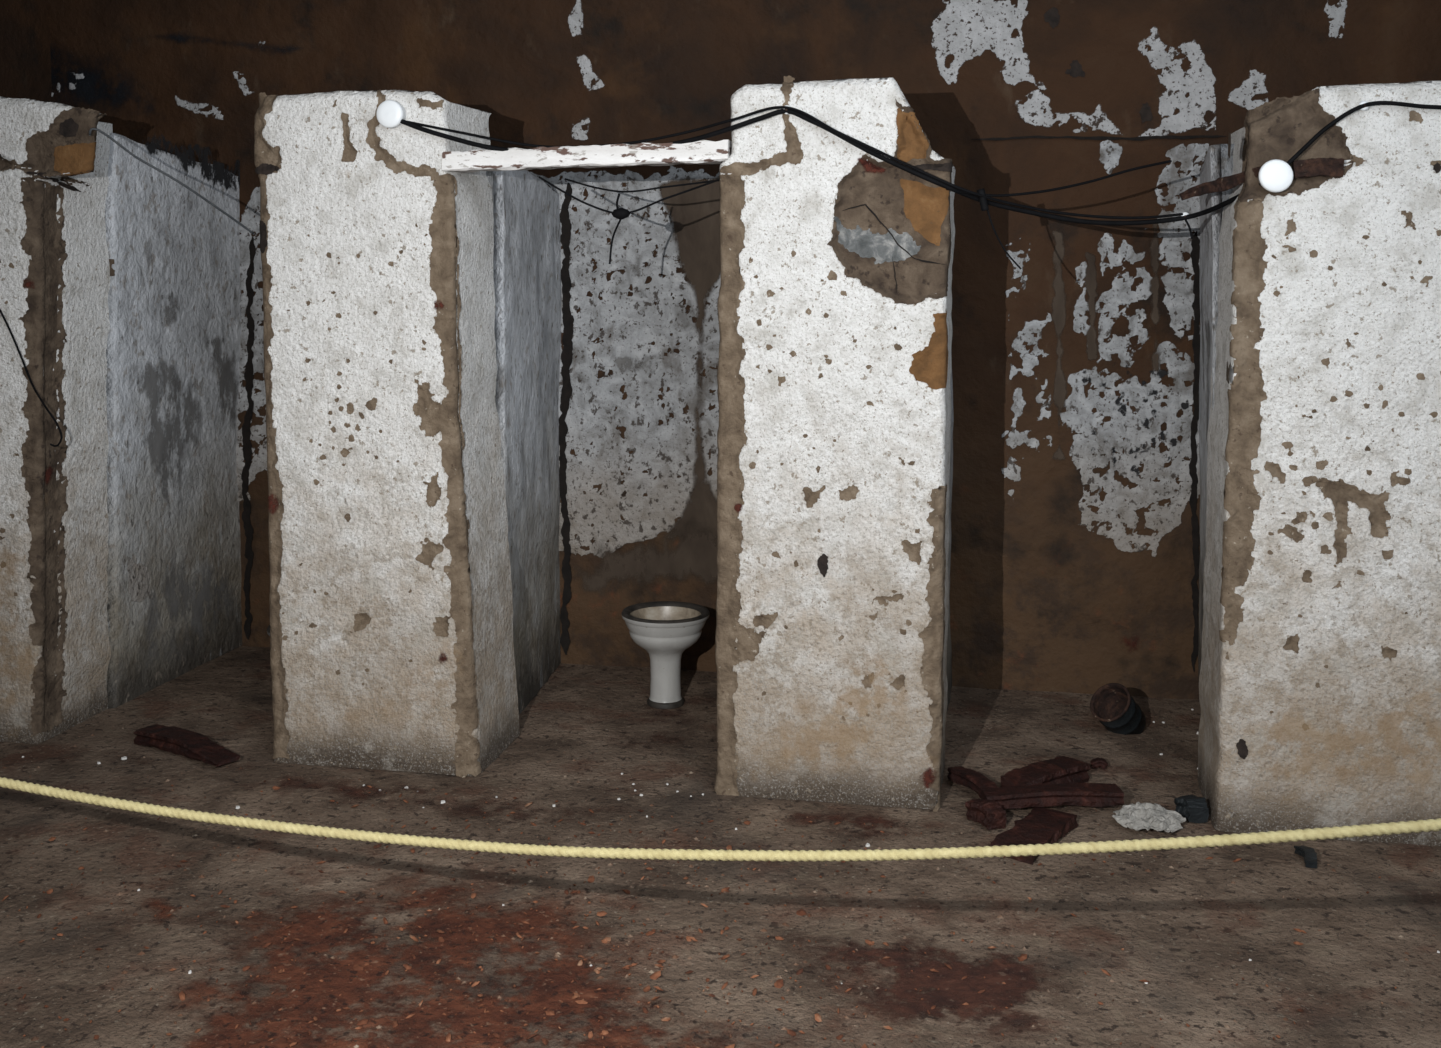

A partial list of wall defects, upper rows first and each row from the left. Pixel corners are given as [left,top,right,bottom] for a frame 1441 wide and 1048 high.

flaking render [0,107,107,736]
flaking render [332,90,482,778]
peeling [568,0,583,36]
peeling [576,55,604,90]
peeling [530,75,804,796]
flaking render [802,466,860,508]
flaking render [821,99,952,389]
peeling [931,0,1123,174]
peeling [1001,27,1412,660]
flaking render [1401,210,1416,230]
flaking render [861,484,947,812]
flaking render [1366,646,1397,667]